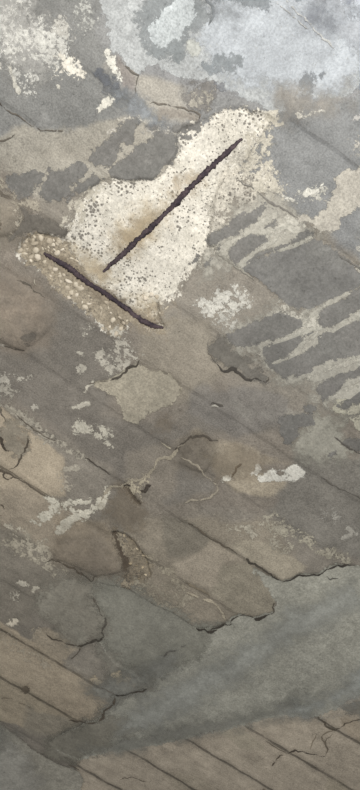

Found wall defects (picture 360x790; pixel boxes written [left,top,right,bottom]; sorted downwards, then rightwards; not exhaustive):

leakage [281,183,328,204]
spalling [0,0,360,465]
leakage [217,211,313,268]
leakage [192,283,253,333]
leakage [270,291,360,364]
leakage [327,381,360,400]
crack [83,434,242,504]
crack [189,523,352,582]
peeling [0,527,360,790]
leakage [87,587,360,754]